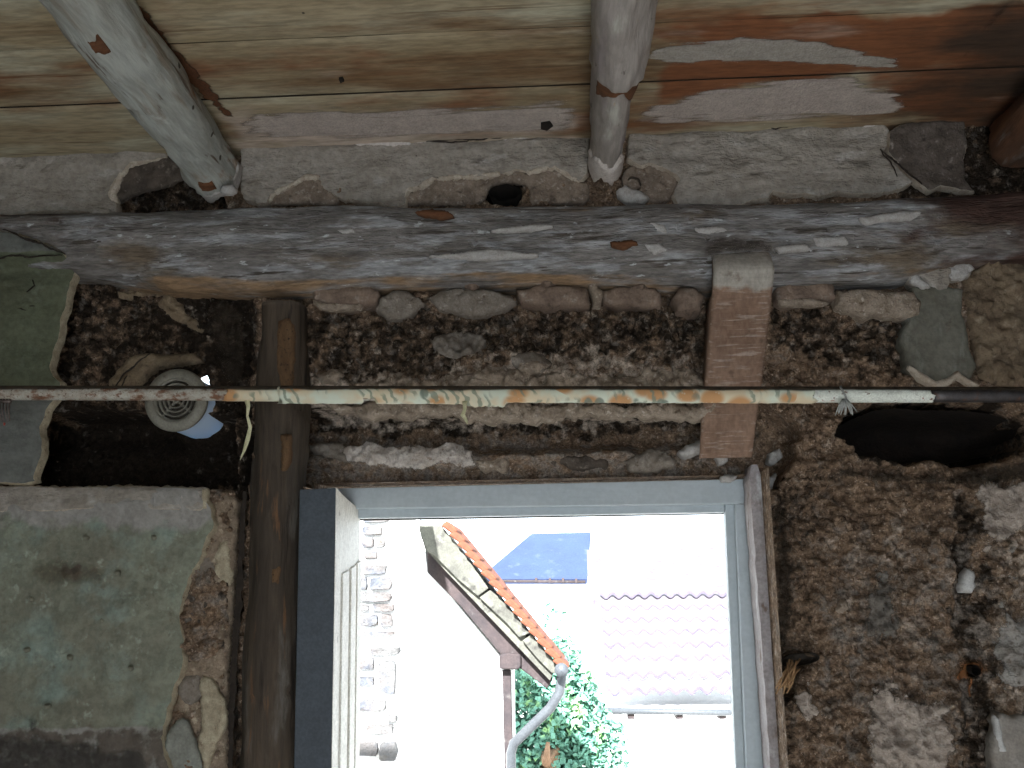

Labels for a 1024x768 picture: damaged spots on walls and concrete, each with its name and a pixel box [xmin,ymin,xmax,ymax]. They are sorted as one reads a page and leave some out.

spalling [9,154,184,215]
spalling [240,139,590,208]
spalling [49,273,80,386]
spalling [834,409,1018,466]
spalling [0,400,241,768]